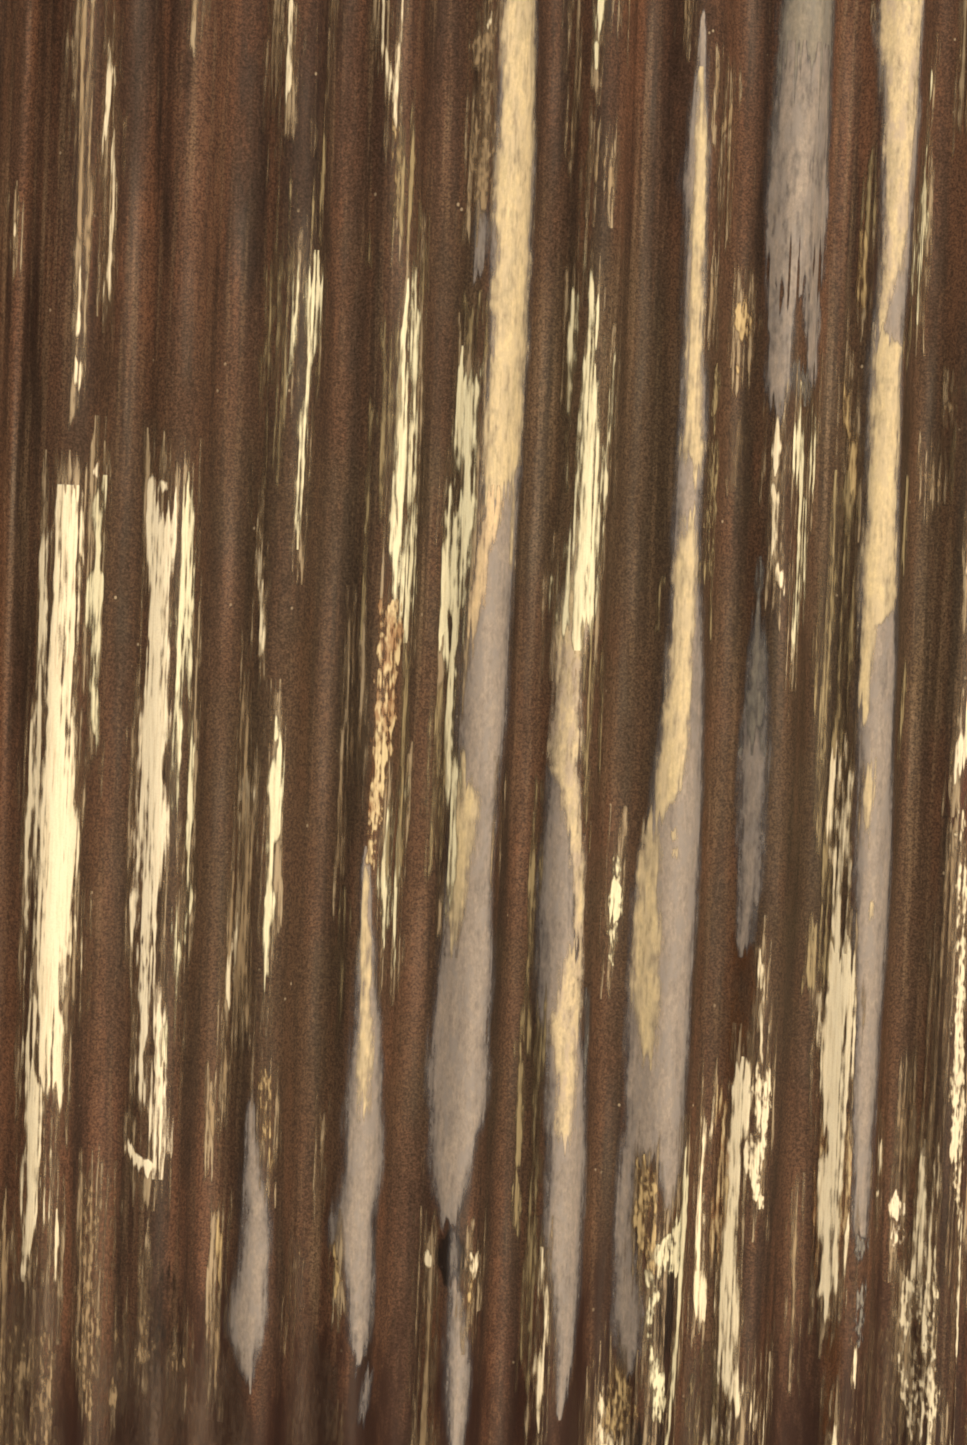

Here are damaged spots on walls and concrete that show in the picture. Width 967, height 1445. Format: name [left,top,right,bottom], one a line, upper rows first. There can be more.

peeling [190,0,205,57]
peeling [264,0,298,145]
peeling [65,0,125,425]
peeling [0,121,326,1445]
peeling [313,0,537,1445]
peeling [512,0,967,1445]
rust [950,759,967,818]
rust [752,915,776,1080]
rust [659,1265,674,1367]
rust [631,1419,665,1445]